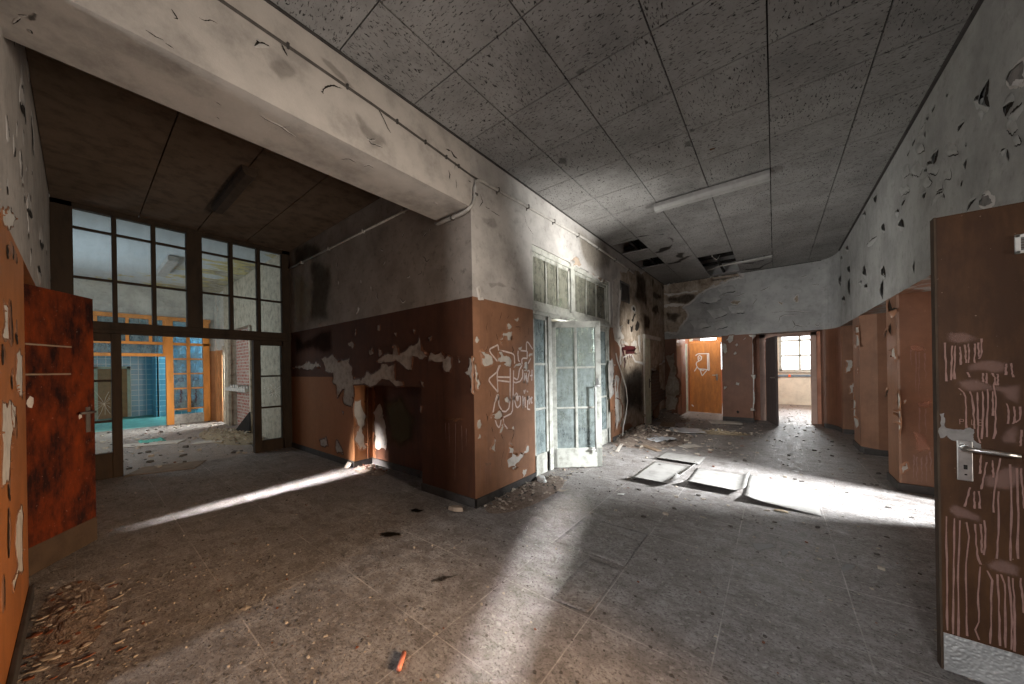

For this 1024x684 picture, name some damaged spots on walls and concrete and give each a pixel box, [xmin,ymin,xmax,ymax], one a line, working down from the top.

flaking render [1002,57,1024,121]
peeling [1,193,47,254]
peeling [979,190,995,209]
water stain [635,276,694,329]
flaking render [570,255,745,429]
peeling [1,298,34,489]
peeling [292,316,533,451]
water stain [625,369,642,410]
peeling [319,437,352,469]
peeling [476,395,530,478]
peeling [1,504,25,613]